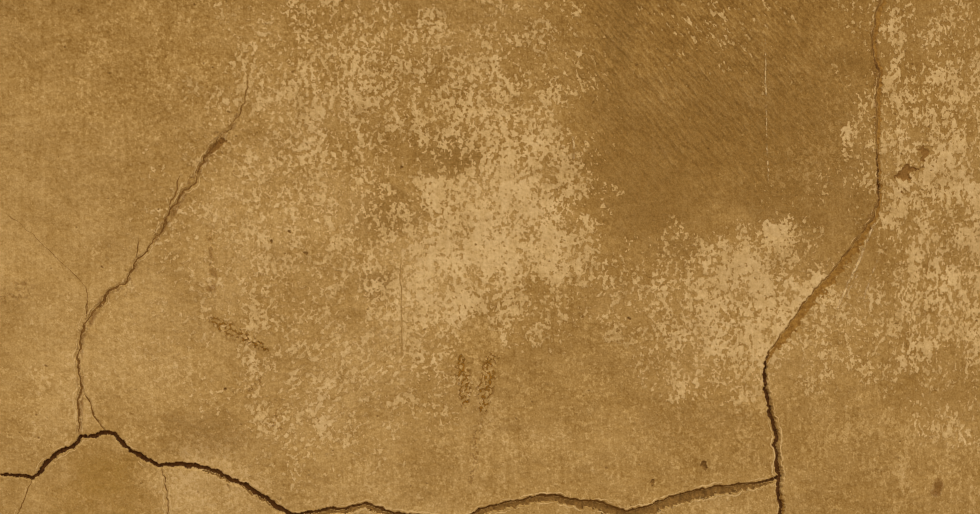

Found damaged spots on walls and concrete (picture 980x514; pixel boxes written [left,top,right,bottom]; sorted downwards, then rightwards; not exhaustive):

crack [1,78,438,514]
crack [466,0,887,514]